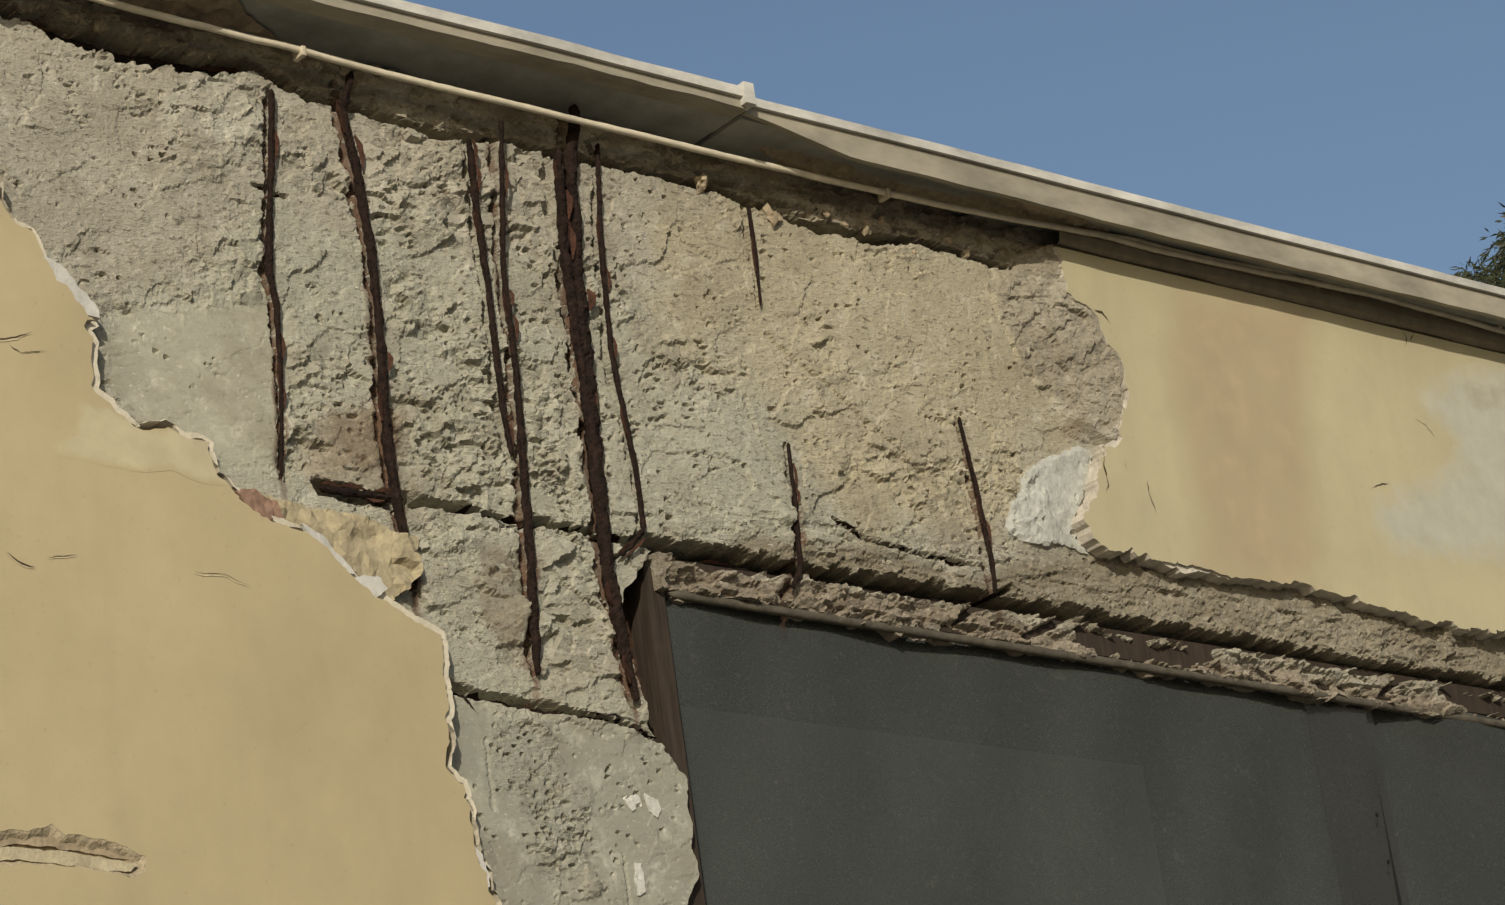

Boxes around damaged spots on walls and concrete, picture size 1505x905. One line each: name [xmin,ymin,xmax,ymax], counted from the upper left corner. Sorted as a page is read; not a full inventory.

crack [0,333,40,353]
crack [9,553,75,569]
corrosion [259,88,287,478]
spalling [0,0,699,905]
corrosion [319,71,409,533]
corrosion [466,120,541,682]
crack [453,692,658,739]
corrosion [553,104,653,728]
corrosion [746,205,762,306]
corrosion [675,442,842,620]
corrosion [862,417,997,607]
spalling [577,118,1505,721]